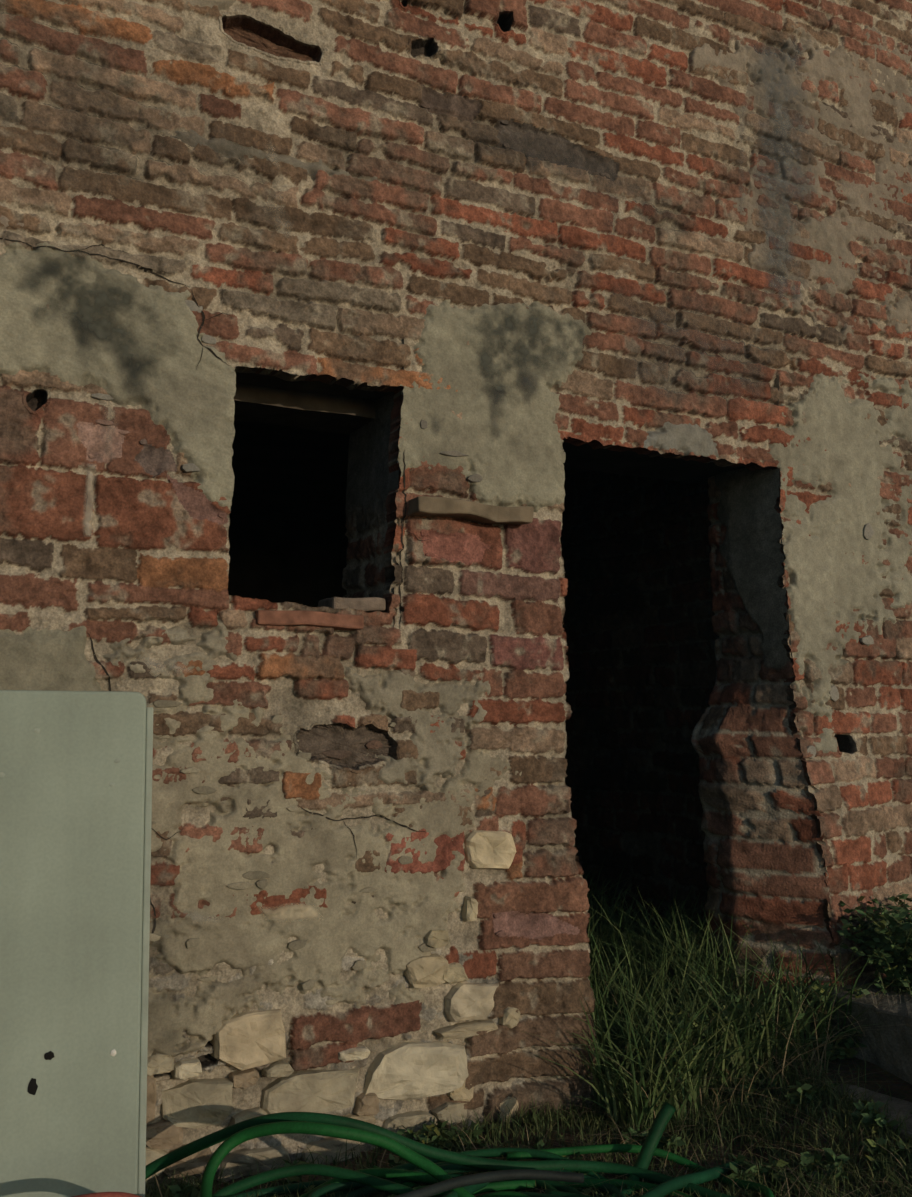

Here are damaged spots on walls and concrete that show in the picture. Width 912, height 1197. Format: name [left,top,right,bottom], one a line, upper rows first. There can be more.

water stain [30,257,153,386]
crack [0,238,234,369]
flaking render [0,241,236,511]
water stain [480,315,565,404]
flaking render [767,372,912,759]
flaking render [102,615,522,1058]
crack [148,897,156,946]